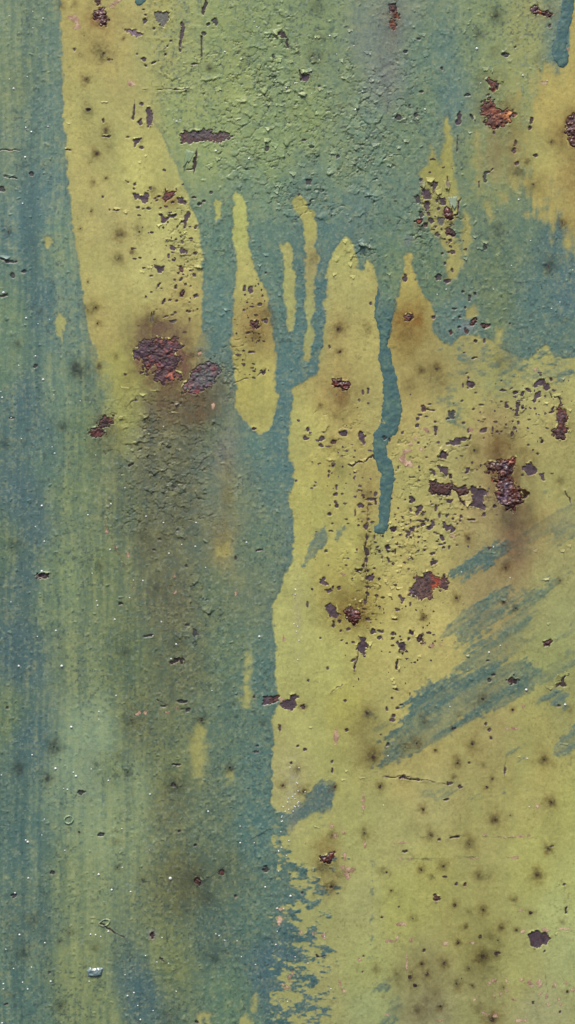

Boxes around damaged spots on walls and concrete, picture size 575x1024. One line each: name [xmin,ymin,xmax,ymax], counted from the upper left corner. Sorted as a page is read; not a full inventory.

rust [92,0,112,28]
rust [480,76,517,129]
peeling [127,103,153,163]
peeling [414,158,500,283]
peeling [109,183,213,333]
rust [131,322,221,420]
rust [551,402,570,442]
rust [484,439,527,514]
peeling [297,372,572,722]
rust [408,570,458,601]
peeling [254,692,305,711]
peeling [528,928,552,952]